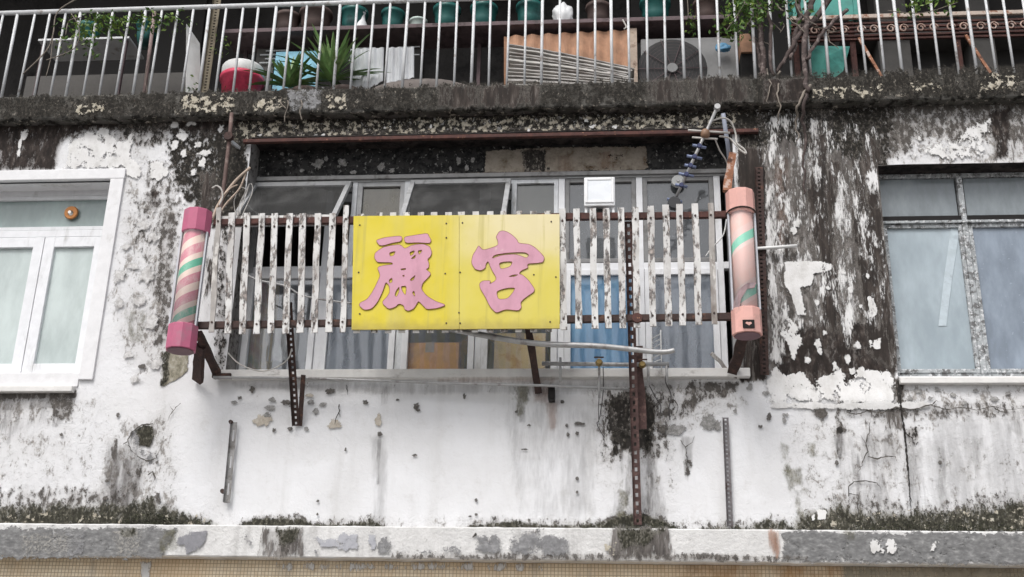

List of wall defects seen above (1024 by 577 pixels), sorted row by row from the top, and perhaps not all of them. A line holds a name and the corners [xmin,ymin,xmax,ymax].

peeling [63,128,169,181]
peeling [170,122,211,175]
peeling [760,115,822,186]
water stain [0,64,1024,462]
peeling [746,181,1024,445]
spalling [130,425,159,464]
crack [847,380,1021,514]
water stain [0,463,212,525]
peeling [473,528,571,557]
water stain [260,491,808,571]
corrosion [769,530,779,557]
water stain [789,491,1024,532]